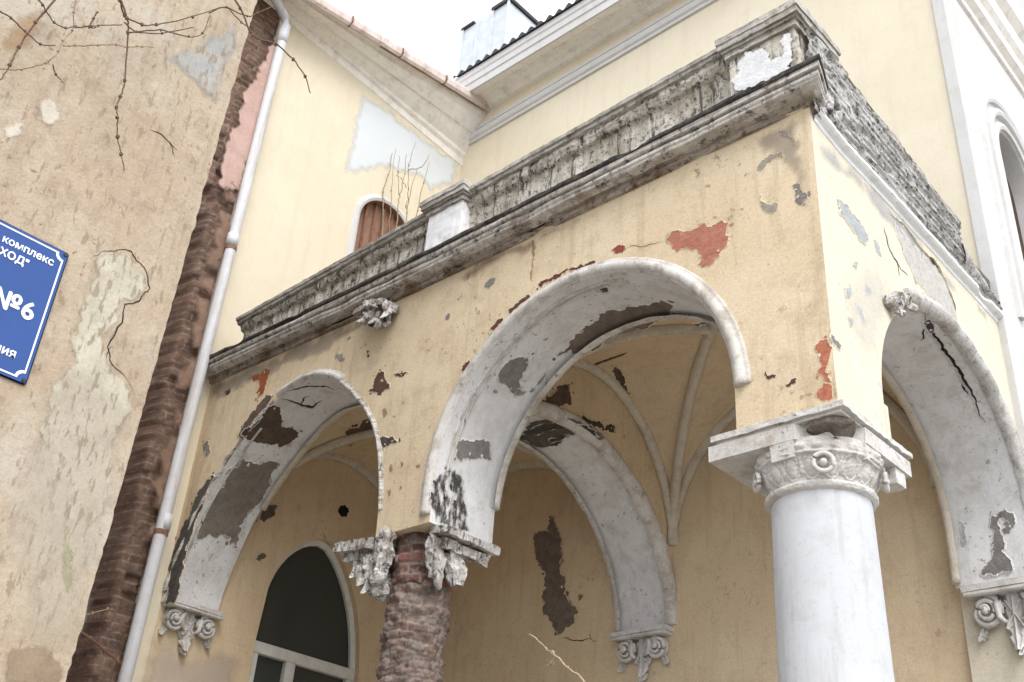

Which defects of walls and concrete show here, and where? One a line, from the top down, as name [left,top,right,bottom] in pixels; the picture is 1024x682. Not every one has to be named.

flaking render [730,33,793,91]
flaking render [178,42,276,387]
spalling [665,219,734,269]
crack [884,214,957,318]
crack [95,249,150,395]
spalling [238,394,303,448]
crack [281,386,334,409]
spalling [552,299,675,361]
crack [921,316,985,423]
peeling [430,437,492,530]
spalling [164,458,280,610]
spalling [979,509,1017,579]